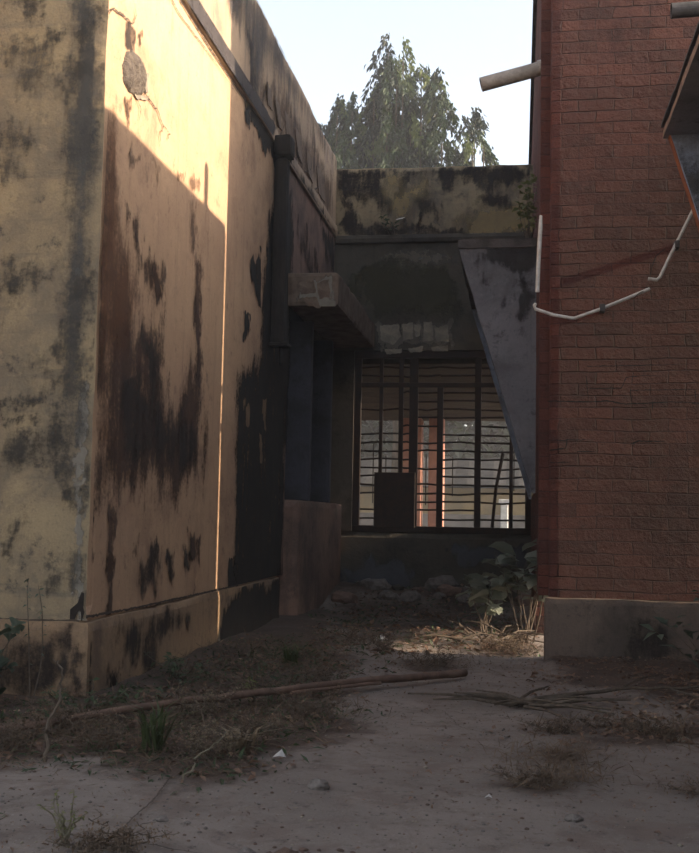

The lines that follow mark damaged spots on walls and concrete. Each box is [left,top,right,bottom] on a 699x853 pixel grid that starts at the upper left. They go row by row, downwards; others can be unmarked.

crack [106,5,137,24]
crack [137,93,170,146]
crack [169,0,294,135]
water stain [187,0,302,168]
water stain [290,160,471,273]
water stain [438,165,532,209]
water stain [0,0,208,615]
water stain [217,192,294,642]
water stain [118,605,190,671]